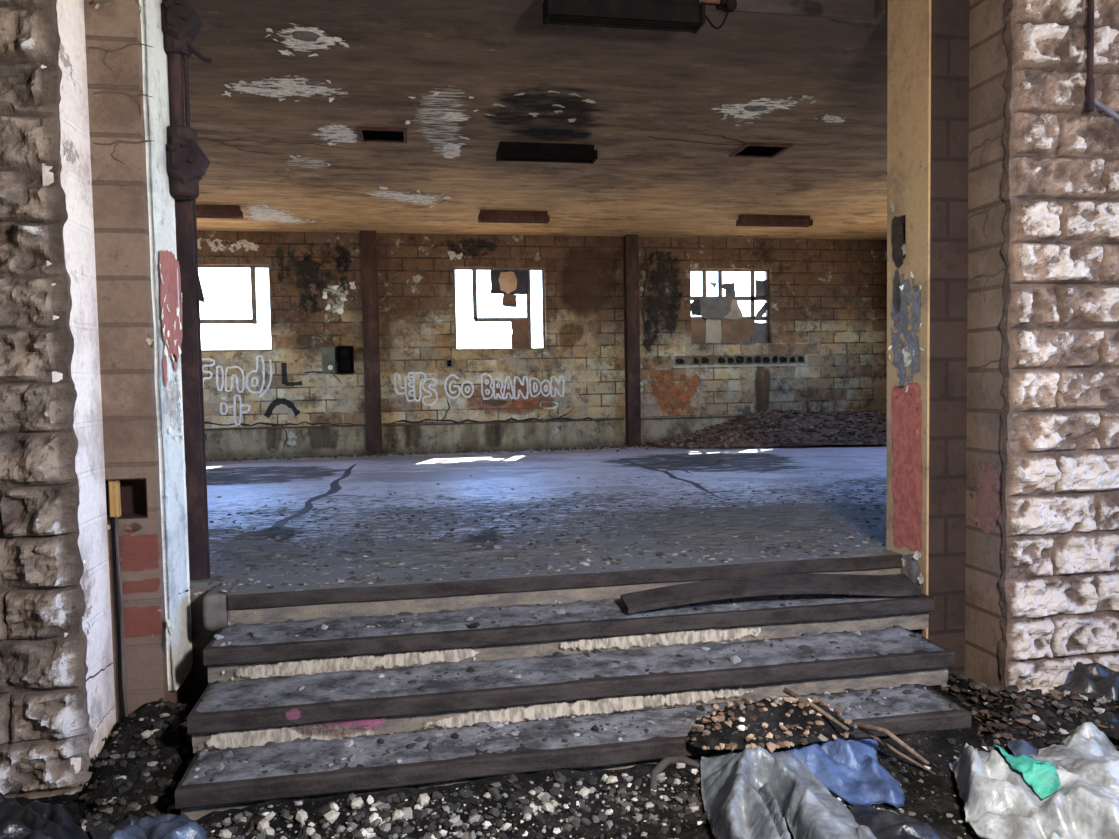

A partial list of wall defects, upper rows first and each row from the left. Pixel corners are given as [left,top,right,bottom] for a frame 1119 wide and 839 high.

peeling [266,23,349,56]
peeling [222,75,347,103]
peeling [311,124,361,146]
peeling [405,88,525,158]
peeling [711,95,817,126]
peeling [368,187,451,208]
damp [644,252,683,352]
crack [272,464,364,527]
crack [619,459,730,501]